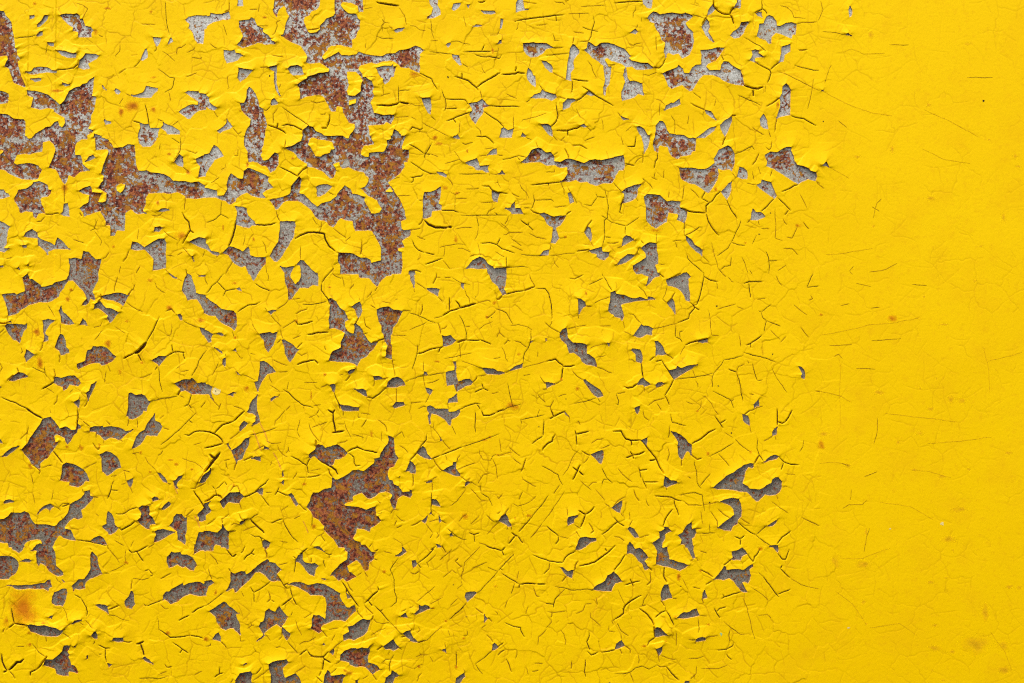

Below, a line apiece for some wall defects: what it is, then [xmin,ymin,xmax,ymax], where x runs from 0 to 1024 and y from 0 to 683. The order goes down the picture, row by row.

peeling [0,0,439,387]
peeling [460,0,833,367]
crack [657,2,897,185]
peeling [0,346,162,676]
peeling [133,464,263,604]
peeling [210,436,472,683]
peeling [324,297,406,411]
crack [0,1,819,682]
peeling [627,516,696,571]
peeling [709,455,782,531]
crack [797,248,916,423]
crack [874,413,986,443]